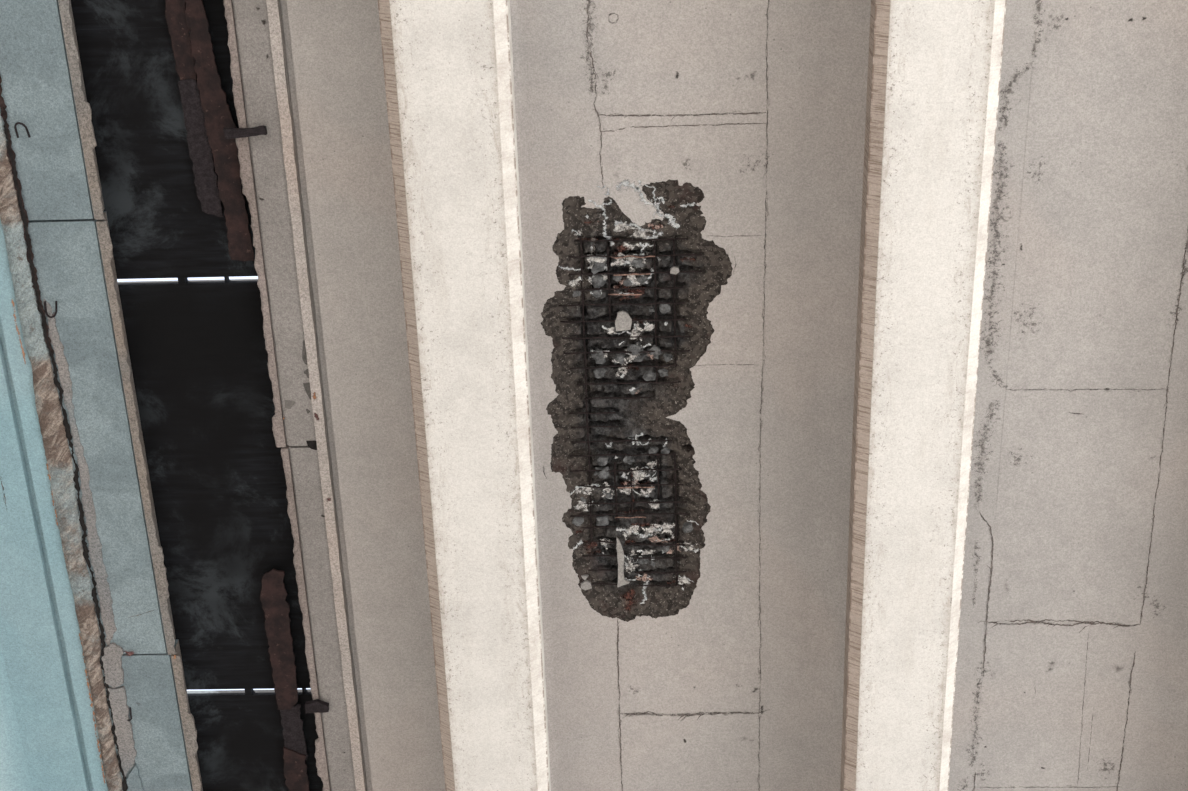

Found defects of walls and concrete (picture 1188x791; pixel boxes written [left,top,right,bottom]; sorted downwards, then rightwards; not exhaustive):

crack [0,76,154,791]
spalling [541,179,733,622]
crack [586,0,769,791]
crack [972,231,1188,791]